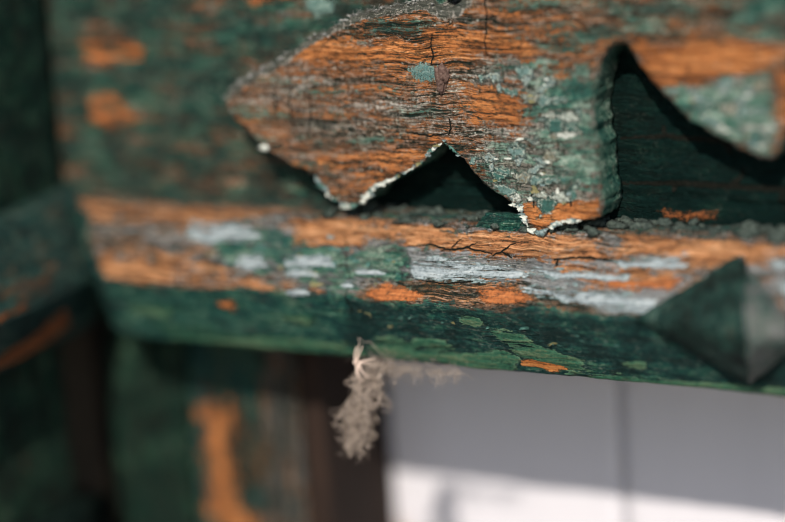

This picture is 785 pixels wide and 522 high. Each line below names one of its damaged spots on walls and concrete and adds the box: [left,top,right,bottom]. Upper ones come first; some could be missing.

peeling [407,60,438,83]
crack [424,34,434,66]
peeling [669,72,777,149]
peeling [315,140,460,209]
peeling [469,60,583,237]
peeling [662,208,717,221]
peeling [185,219,424,302]
crack [407,239,516,284]
peeling [471,257,688,314]